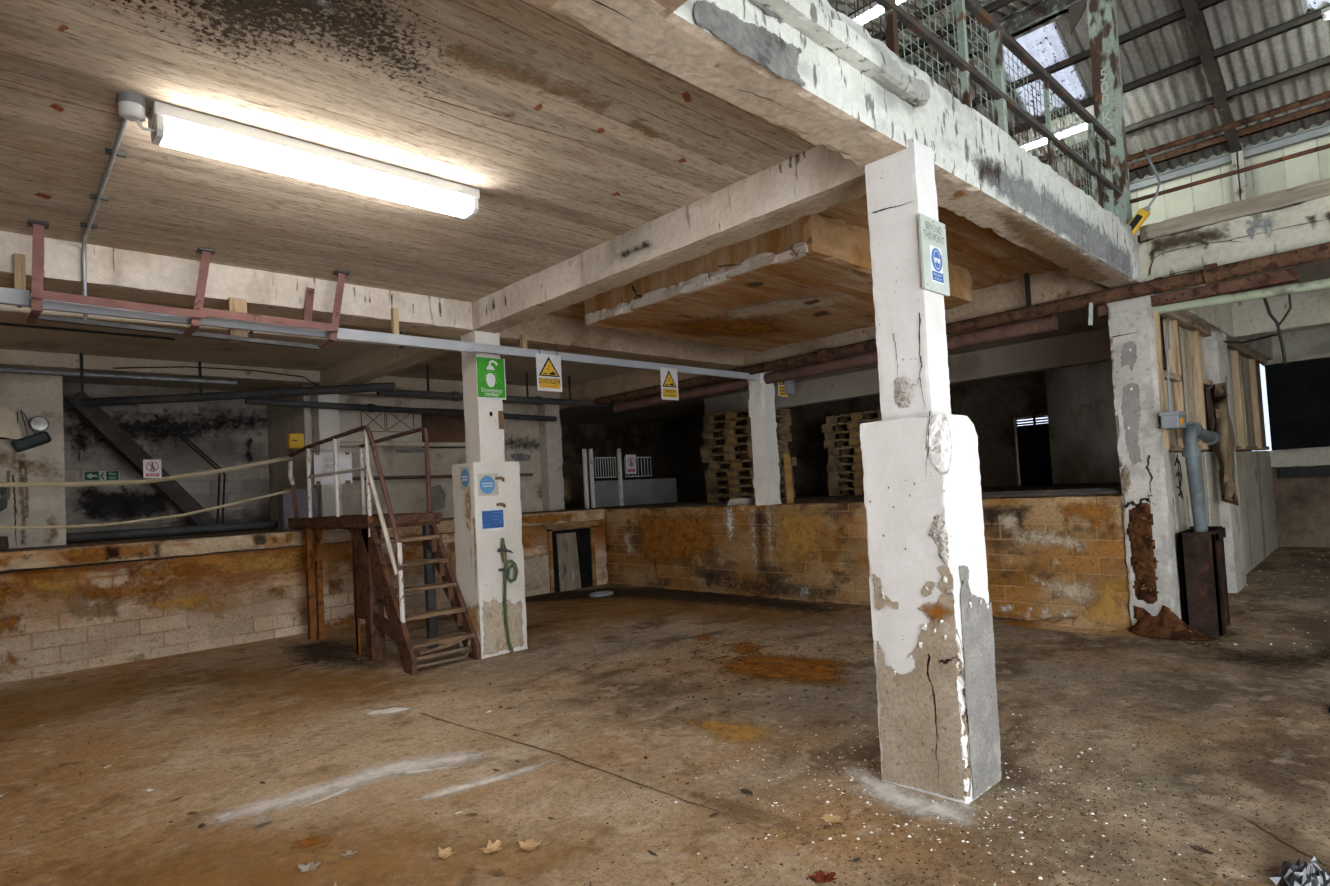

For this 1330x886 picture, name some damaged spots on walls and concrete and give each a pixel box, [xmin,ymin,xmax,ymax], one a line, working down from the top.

damp [111,0,608,112]
damp [631,120,659,137]
damp [525,509,832,615]
peeling [872,574,899,610]
damp [71,604,117,620]
damp [279,639,381,669]
peeling [877,513,1002,800]